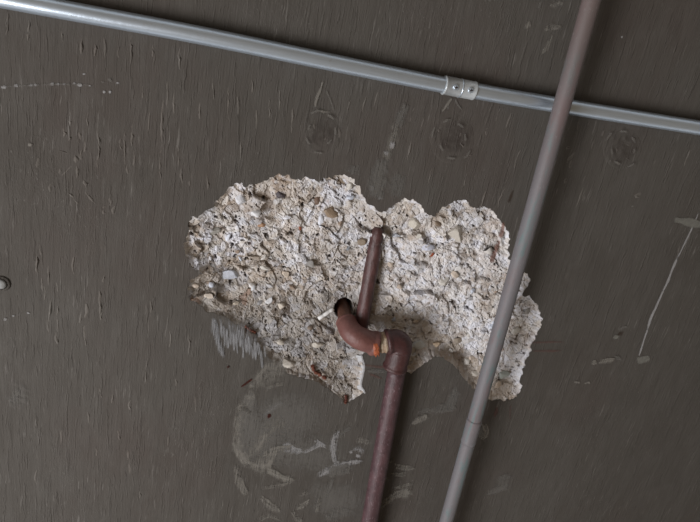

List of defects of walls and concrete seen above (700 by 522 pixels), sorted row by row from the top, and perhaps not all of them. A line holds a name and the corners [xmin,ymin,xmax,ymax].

spalling [183,173,510,403]
spalling [488,273,543,401]